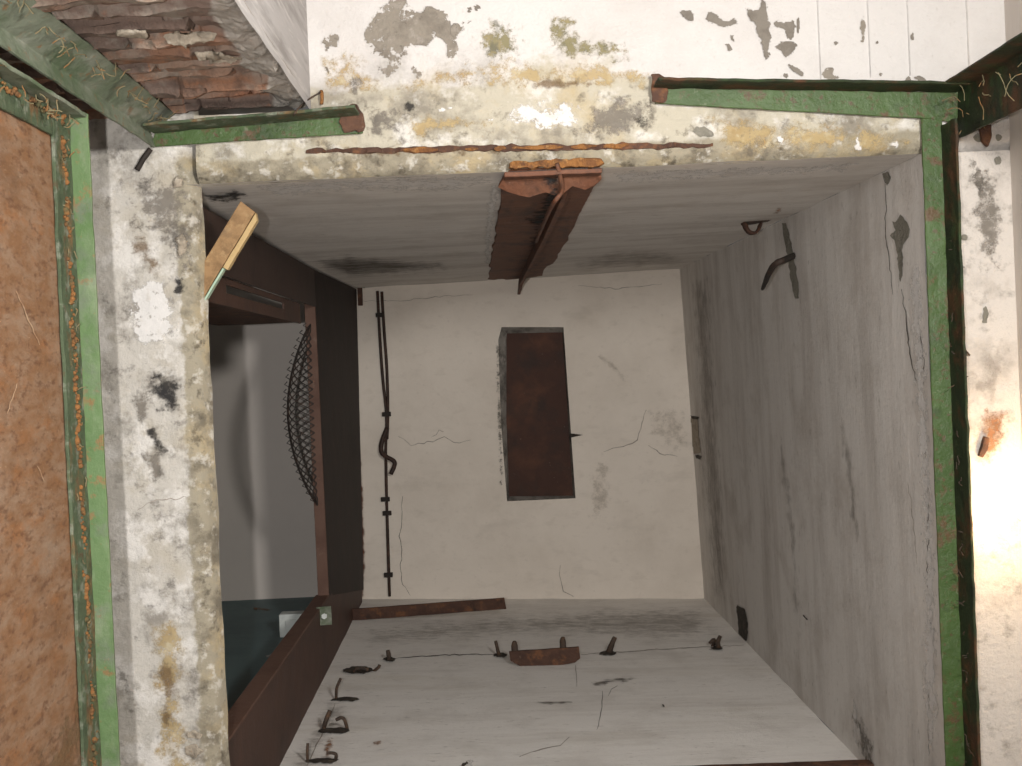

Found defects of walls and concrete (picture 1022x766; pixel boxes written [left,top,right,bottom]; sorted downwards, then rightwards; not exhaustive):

peeling [163,31,243,64]
peeling [364,0,481,79]
damp [480,17,644,89]
peeling [706,12,737,51]
peeling [745,0,804,78]
damp [507,97,651,134]
corrosion [498,166,602,198]
damp [970,161,1001,259]
flaking render [890,215,910,281]
damp [143,428,168,481]
crack [604,411,675,456]
damp [155,622,188,766]